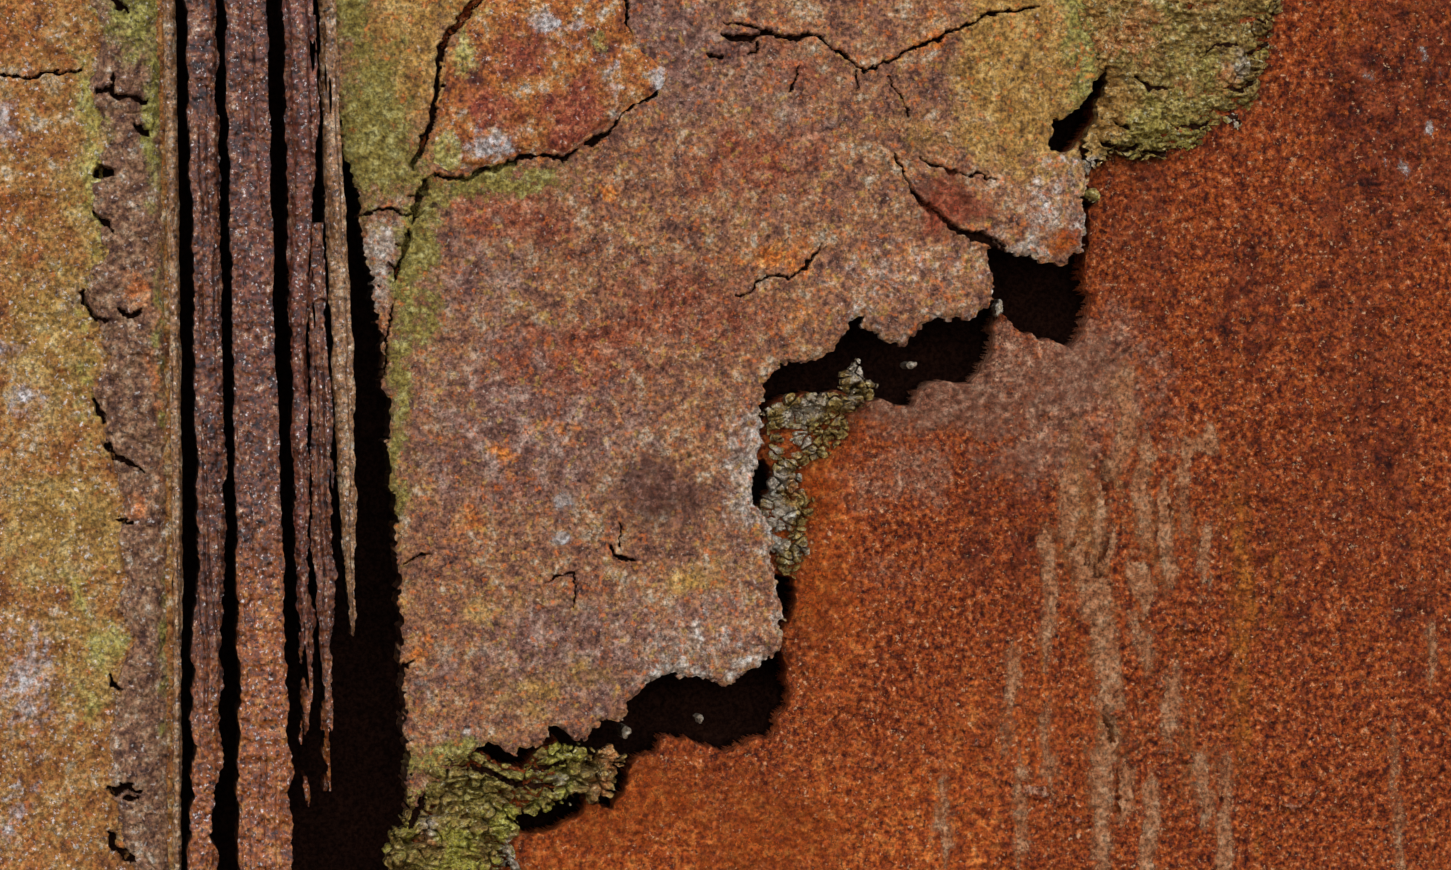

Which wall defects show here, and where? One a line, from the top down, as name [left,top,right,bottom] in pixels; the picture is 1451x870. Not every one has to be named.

crack [706,6,1035,117]
crack [359,0,658,373]
crack [894,153,1006,251]
rust [917,174,992,236]
peeling [84,0,170,870]
rust [790,467,839,526]
rust [795,562,839,635]
water stain [1021,336,1235,870]
water stain [1005,641,1022,715]
water stain [933,776,954,869]
water stain [1004,702,1059,868]
peeling [1021,781,1092,825]